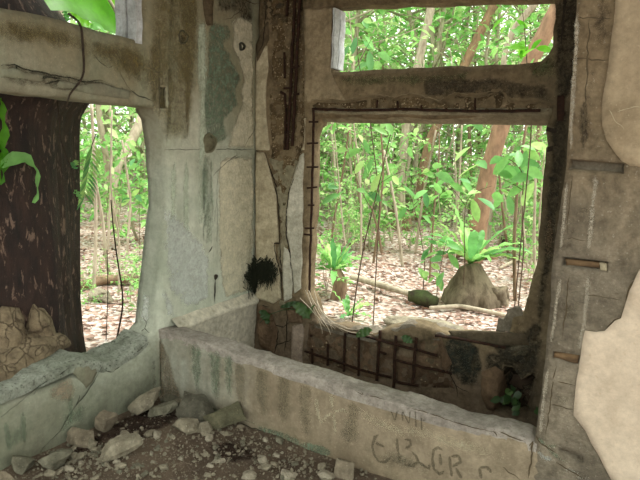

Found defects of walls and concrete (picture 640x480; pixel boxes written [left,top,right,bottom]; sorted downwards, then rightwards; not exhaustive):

crack [1,55,152,101]
leakage [96,0,254,304]
crack [212,133,299,353]
peeling [255,0,530,389]
leakage [394,73,546,98]
leakage [539,111,566,316]
leakage [533,0,577,97]
crack [567,176,585,241]
crack [561,0,610,141]
leakage [446,325,541,401]